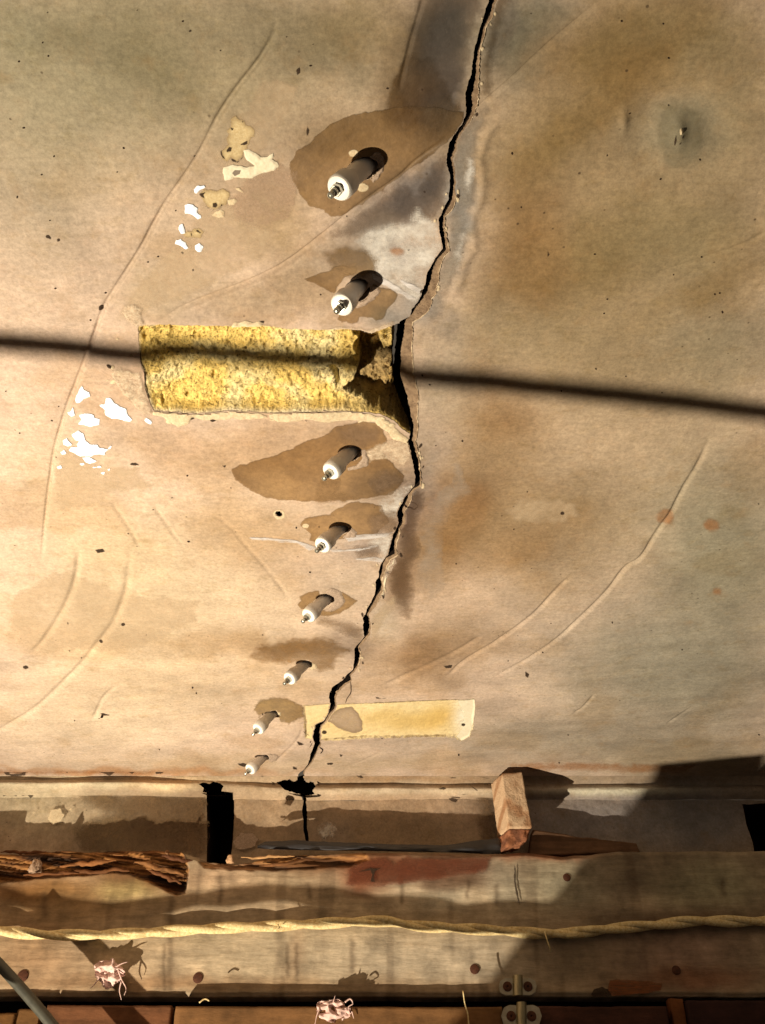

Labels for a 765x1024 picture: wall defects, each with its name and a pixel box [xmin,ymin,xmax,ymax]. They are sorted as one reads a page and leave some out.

spalling [175,116,278,254]
damp [290,0,476,324]
spalling [57,305,410,474]
crack [302,0,497,841]
damp [232,421,420,615]
damp [251,639,349,668]
damp [298,591,359,634]
spalling [199,782,227,796]